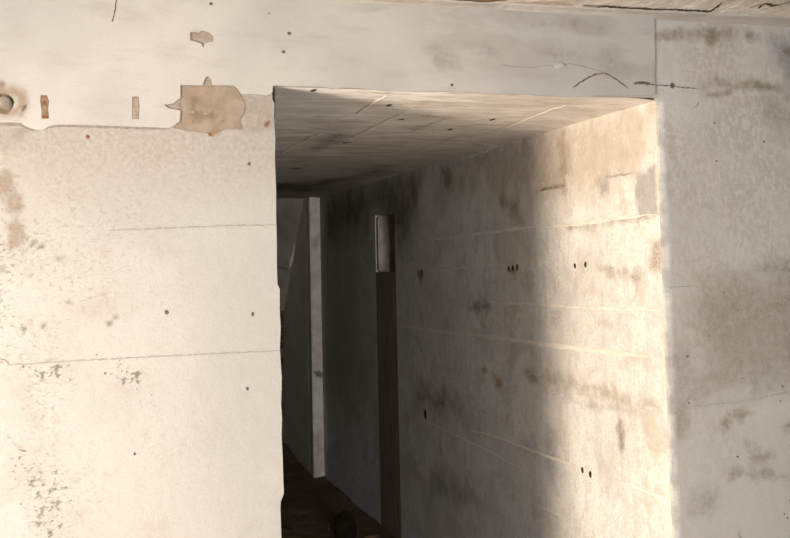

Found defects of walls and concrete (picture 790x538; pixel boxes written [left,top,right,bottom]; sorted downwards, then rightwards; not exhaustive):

crack [457,0,507,8]
crack [751,1,790,9]
flaking render [190,32,213,47]
crack [503,2,722,107]
flaking render [165,77,268,133]
flaking render [50,125,160,139]